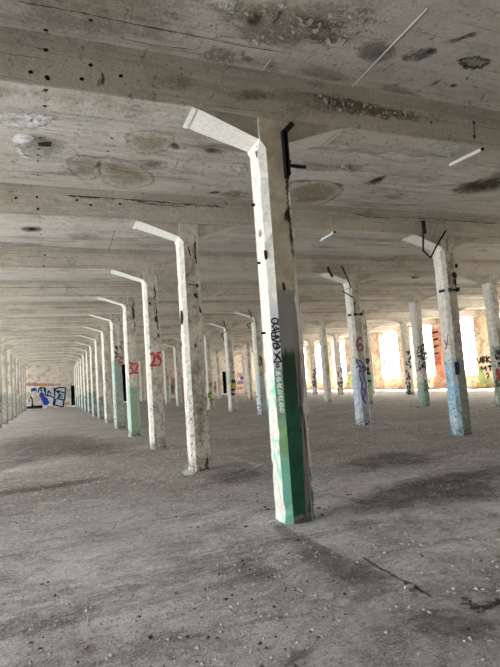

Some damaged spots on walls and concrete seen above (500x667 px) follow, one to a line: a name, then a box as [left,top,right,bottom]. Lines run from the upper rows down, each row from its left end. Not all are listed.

peeling [216,0,373,46]
water stain [453,173,500,194]
crack [357,557,432,597]